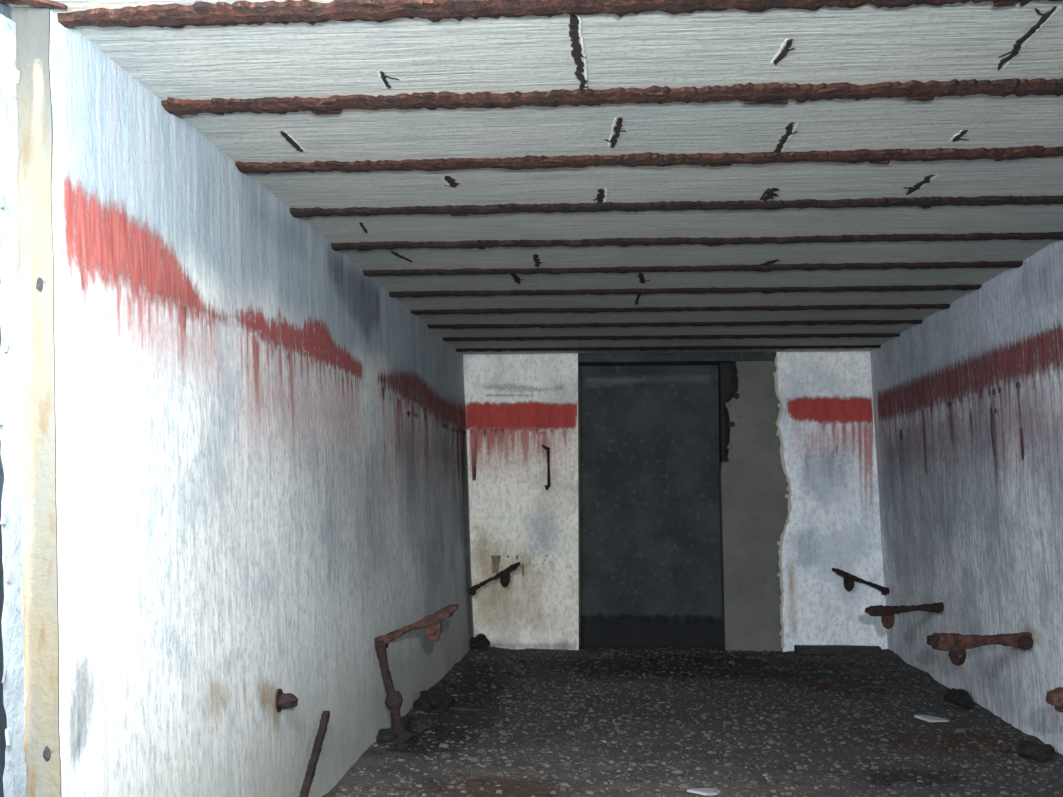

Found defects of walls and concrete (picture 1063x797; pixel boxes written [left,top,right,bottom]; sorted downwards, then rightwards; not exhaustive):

rust [403,0,438,8]
crack [998,6,1061,71]
crack [568,15,588,90]
rust [894,85,934,102]
rust [311,98,342,115]